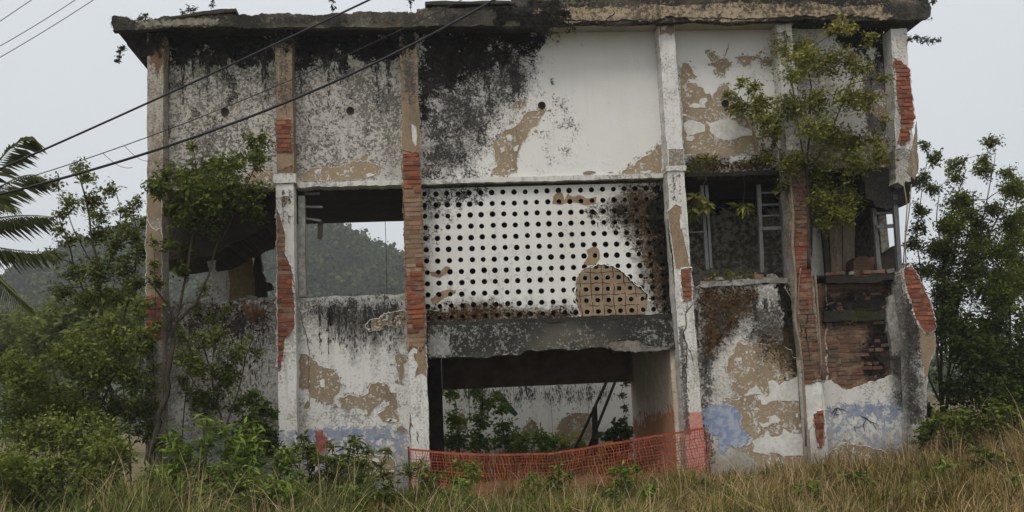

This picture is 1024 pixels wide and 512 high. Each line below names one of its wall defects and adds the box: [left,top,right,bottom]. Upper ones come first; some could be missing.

flaking render [241,118,383,184]
damp [111,0,595,259]
flaking render [488,97,578,177]
flaking render [582,49,773,182]
damp [303,293,406,360]
flaking render [299,125,456,433]
damp [425,297,580,359]
spalling [574,247,649,316]
flaking render [667,204,694,302]
damp [584,147,779,314]
damp [678,281,797,465]
flaking render [722,57,919,470]